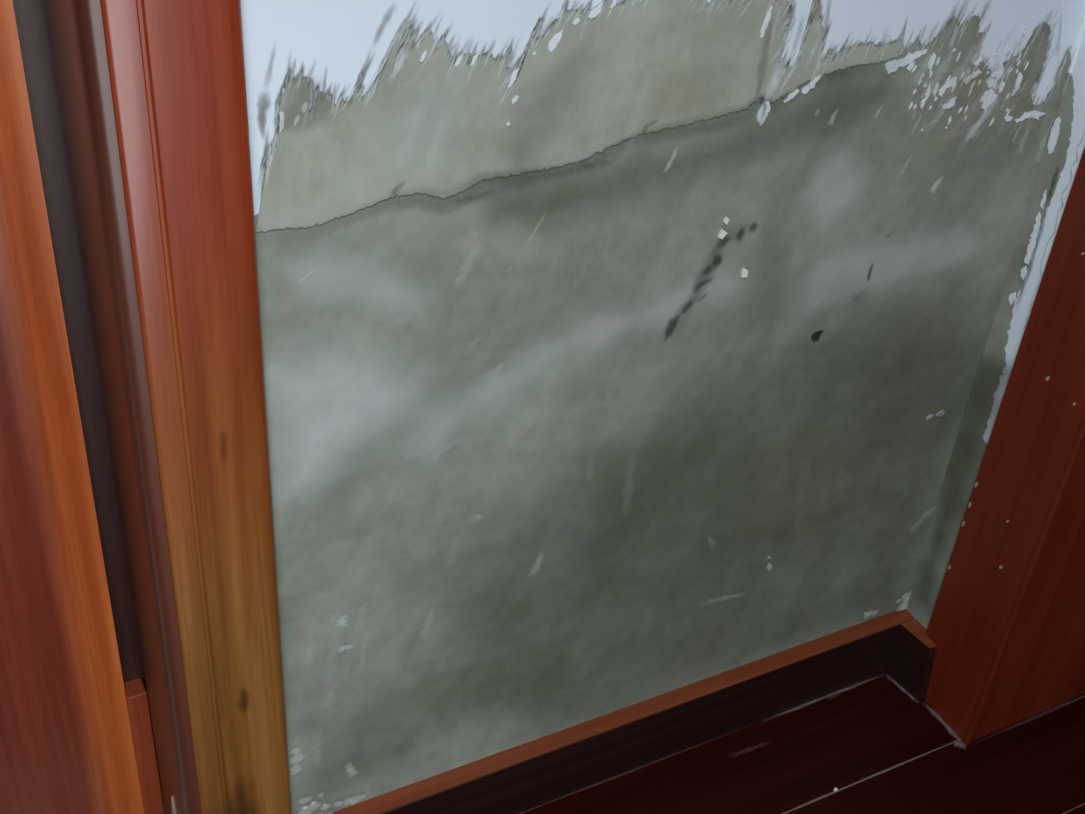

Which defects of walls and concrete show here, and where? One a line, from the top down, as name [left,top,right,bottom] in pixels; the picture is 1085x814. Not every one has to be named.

peeling [254,0,1075,814]
water stain [945,368,1001,518]